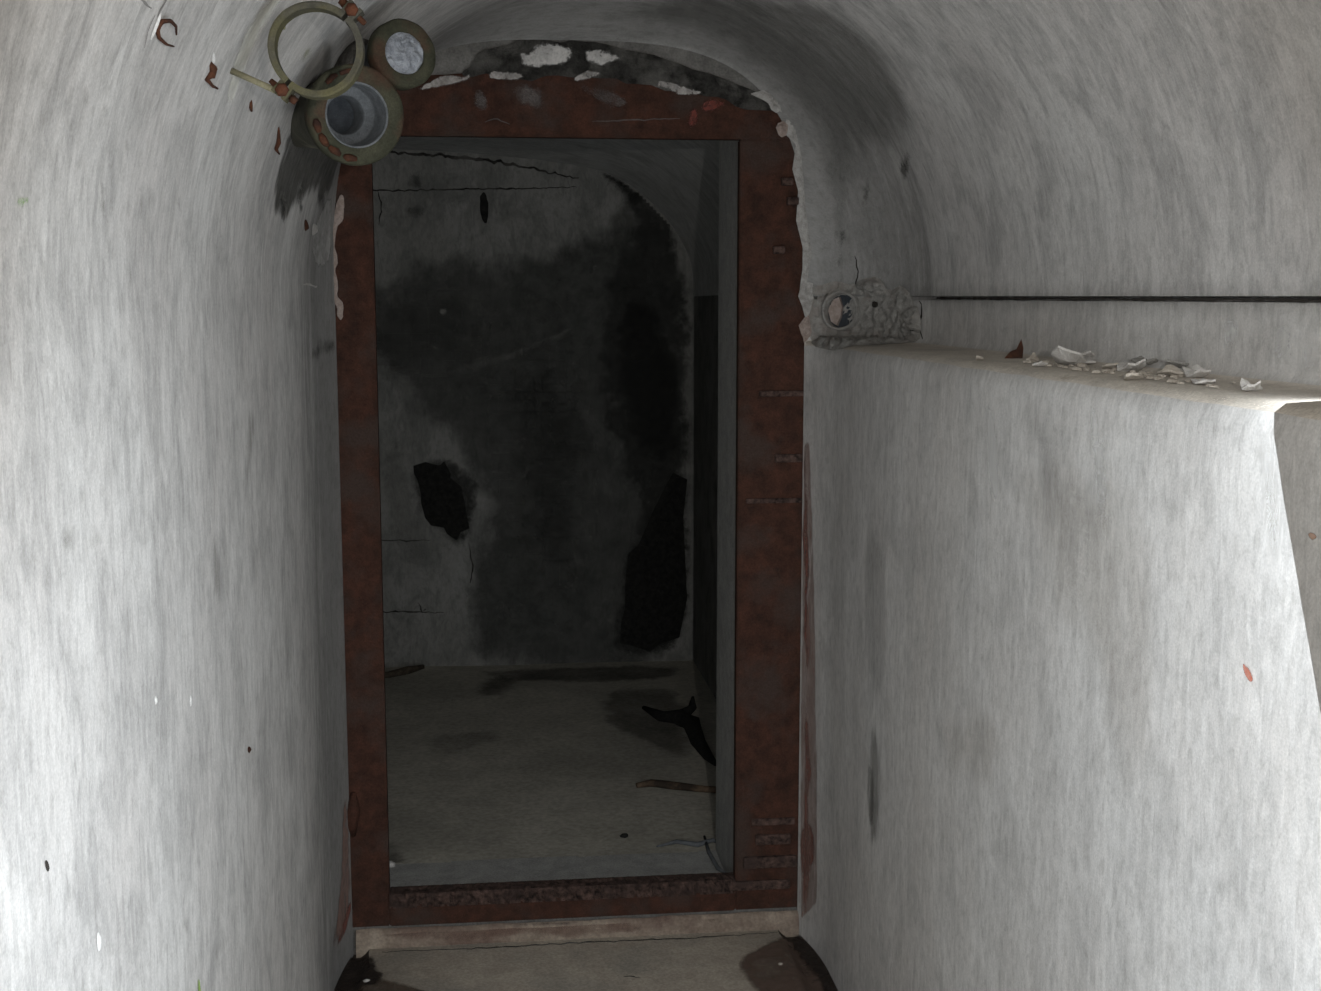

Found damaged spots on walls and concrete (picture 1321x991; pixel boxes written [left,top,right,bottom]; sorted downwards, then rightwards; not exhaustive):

leakage [275,135,338,218]
spalling [422,40,813,342]
leakage [376,173,690,664]
corrosion [800,444,817,916]
corrosion [389,872,736,909]
leakage [334,958,422,991]
leakage [741,935,838,991]